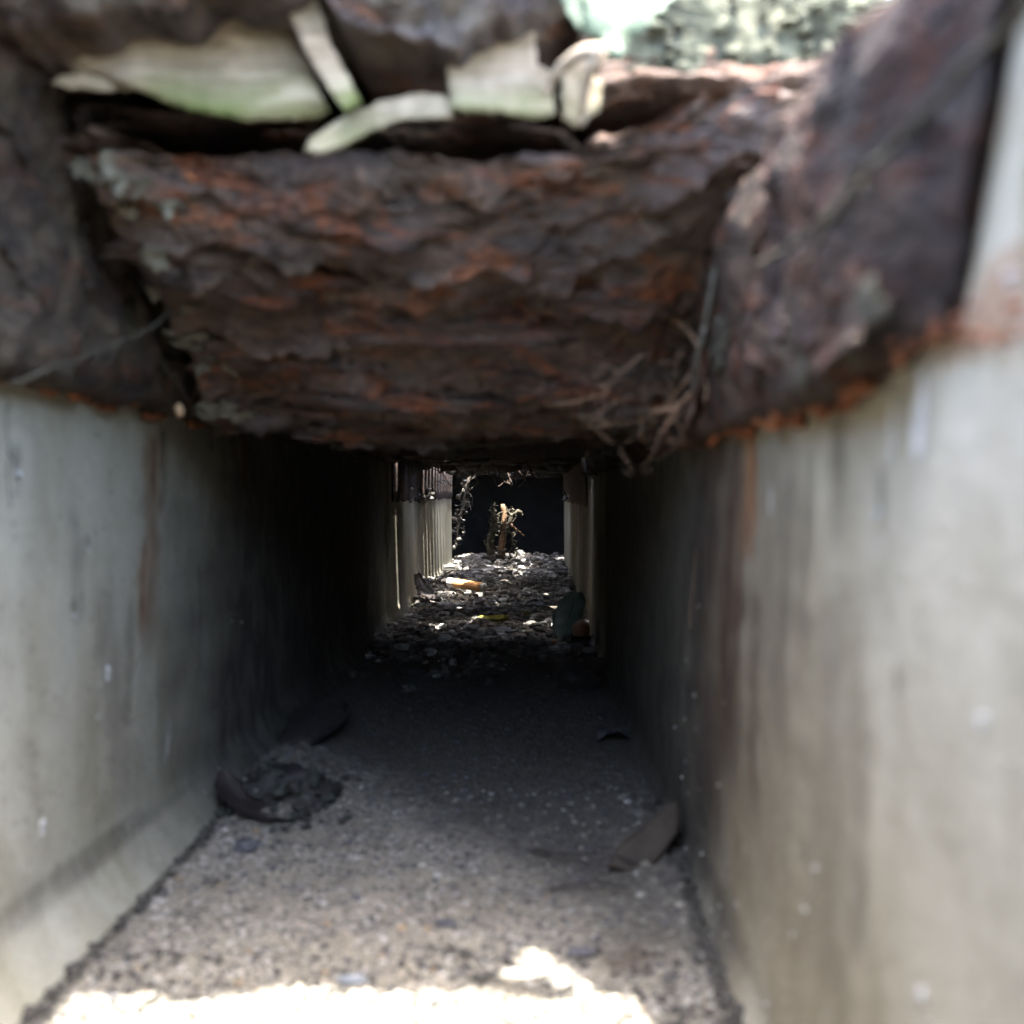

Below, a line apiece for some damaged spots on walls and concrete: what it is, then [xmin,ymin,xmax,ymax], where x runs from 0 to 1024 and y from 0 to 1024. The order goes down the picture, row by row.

rust [708,150,764,204]
rust [264,202,498,257]
rust [75,221,370,313]
rust [481,247,584,286]
rust [250,356,390,374]
rust [340,320,581,349]
rust [558,292,681,335]
rust [683,280,789,430]
rust [806,262,892,379]
rust [226,393,510,456]